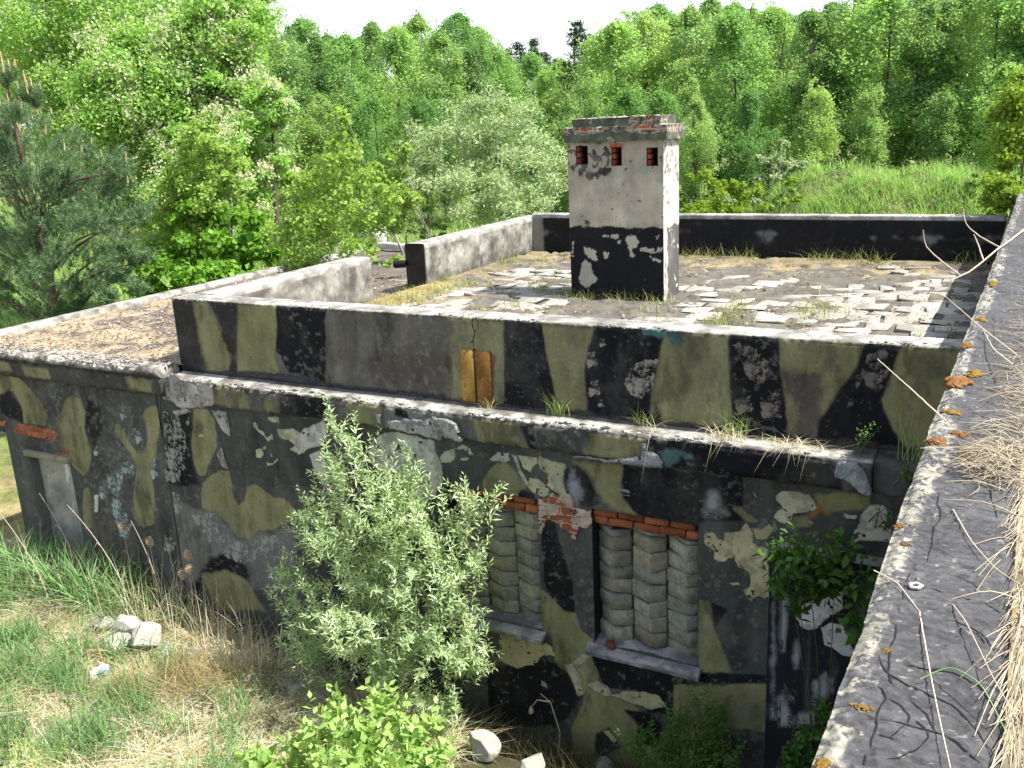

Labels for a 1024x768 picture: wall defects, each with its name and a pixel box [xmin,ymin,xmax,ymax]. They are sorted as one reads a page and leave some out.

peeling [624,359,659,399]
spalling [0,420,69,457]
peeling [99,462,135,538]
flaking render [150,373,733,564]
flaking render [704,491,817,601]
crack [903,491,1011,654]
crack [863,625,1005,768]